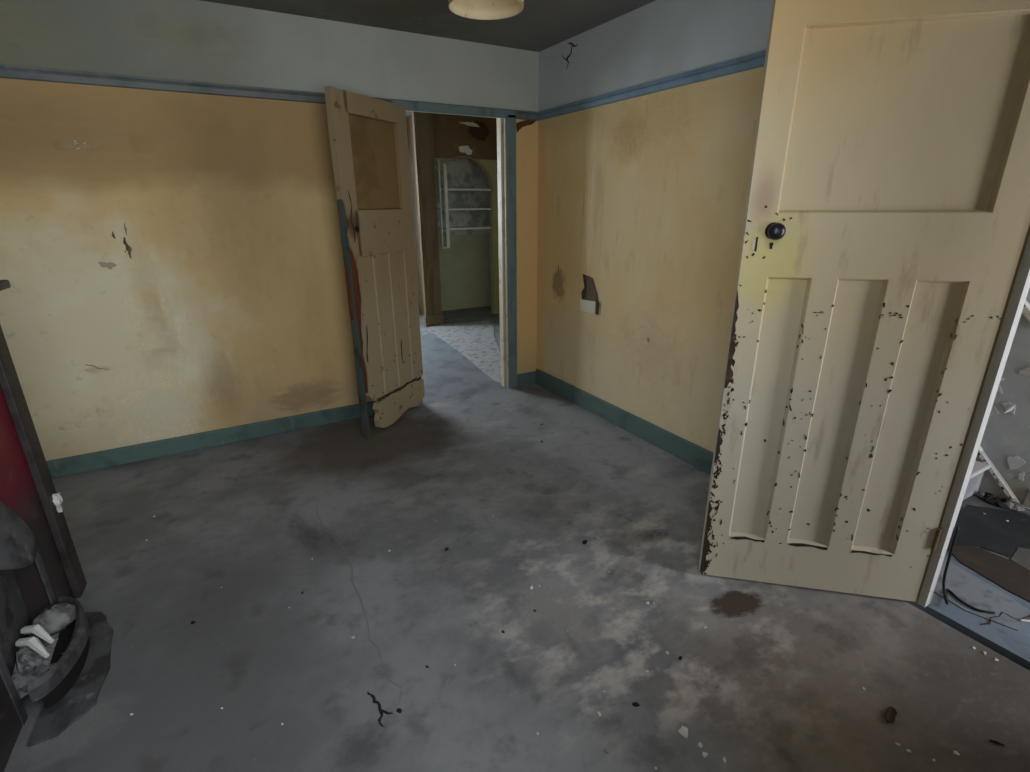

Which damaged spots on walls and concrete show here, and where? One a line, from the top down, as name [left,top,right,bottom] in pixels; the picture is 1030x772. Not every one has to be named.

spalling [581,274,598,301]
peeling [989,377,1016,416]
water stain [711,591,762,617]
crack [367,692,393,727]